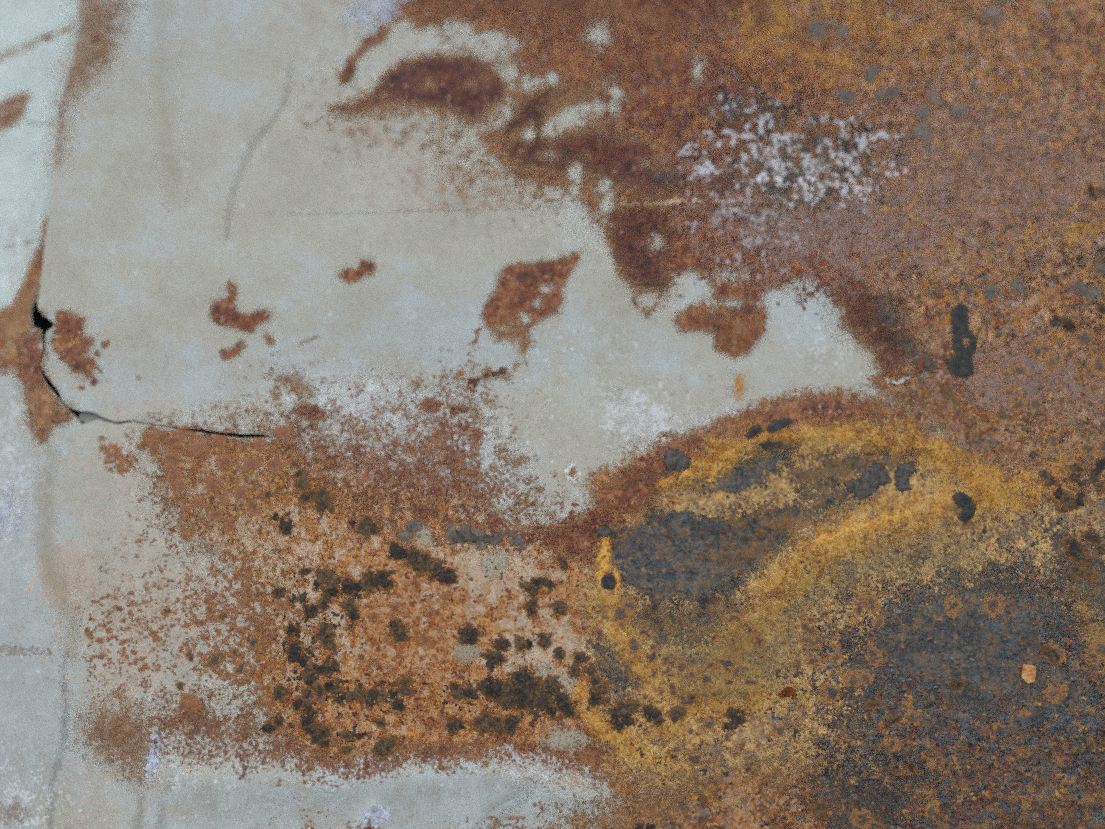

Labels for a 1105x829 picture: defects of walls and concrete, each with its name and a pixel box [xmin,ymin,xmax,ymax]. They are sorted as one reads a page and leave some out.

corrosion [0,90,31,132]
corrosion [337,259,377,285]
corrosion [468,251,582,359]
corrosion [0,214,110,445]
corrosion [209,280,276,361]
corrosion [274,369,318,398]
corrosion [732,374,746,401]
crack [78,411,273,438]
corrosion [564,462,581,484]